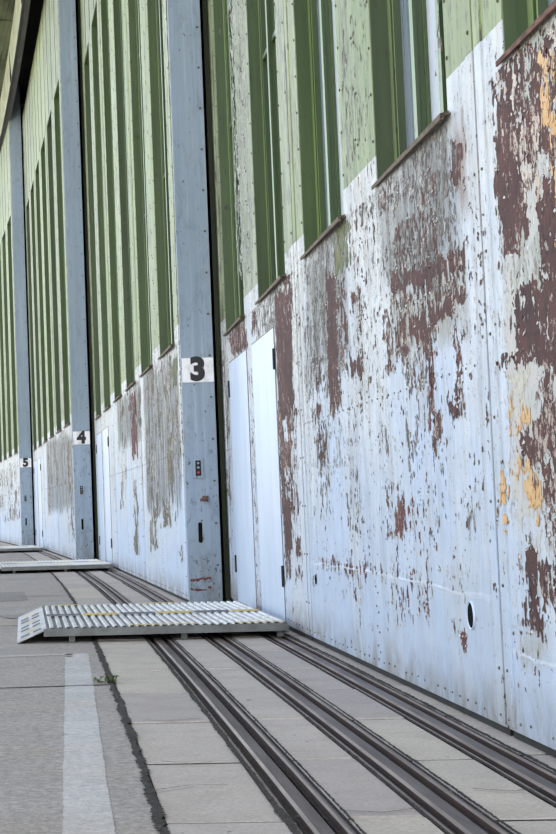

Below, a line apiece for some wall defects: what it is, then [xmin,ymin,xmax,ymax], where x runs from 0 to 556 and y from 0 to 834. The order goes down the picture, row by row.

peeling [227,308,258,357]
peeling [274,271,303,590]
peeling [306,127,486,644]
peeling [469,19,556,685]
peeling [447,613,467,655]